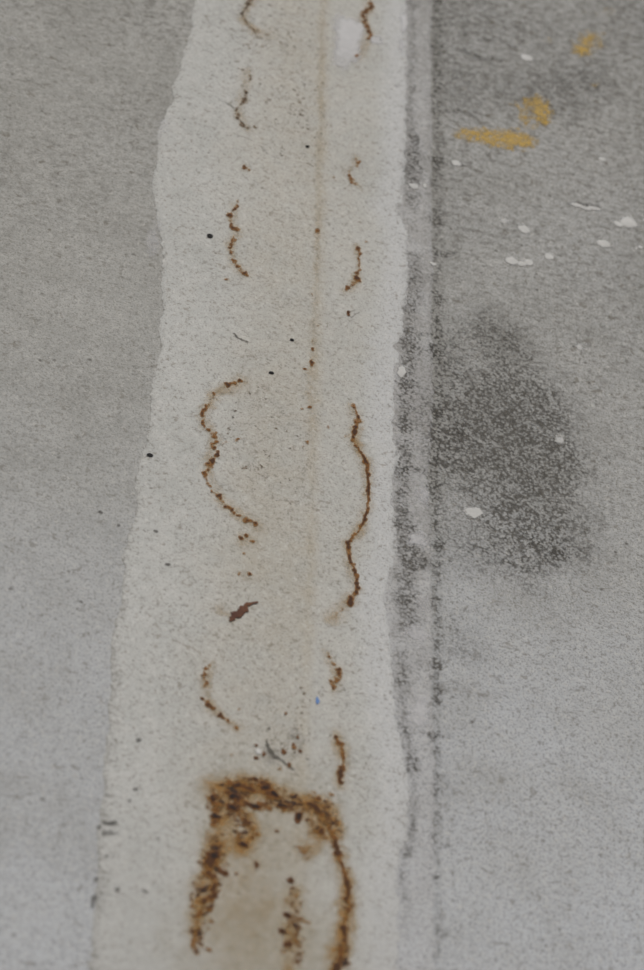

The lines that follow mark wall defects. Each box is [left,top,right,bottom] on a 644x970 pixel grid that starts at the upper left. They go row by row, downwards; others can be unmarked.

rust [361,1,375,40]
leakage [430,40,460,236]
rust [226,200,249,276]
rust [345,246,362,290]
rust [200,392,258,543]
rust [342,404,371,610]
leakage [393,255,588,628]
rust [200,665,238,730]
rust [229,601,258,621]
leakage [432,596,443,703]
rust [334,735,346,784]
rust [190,776,355,970]